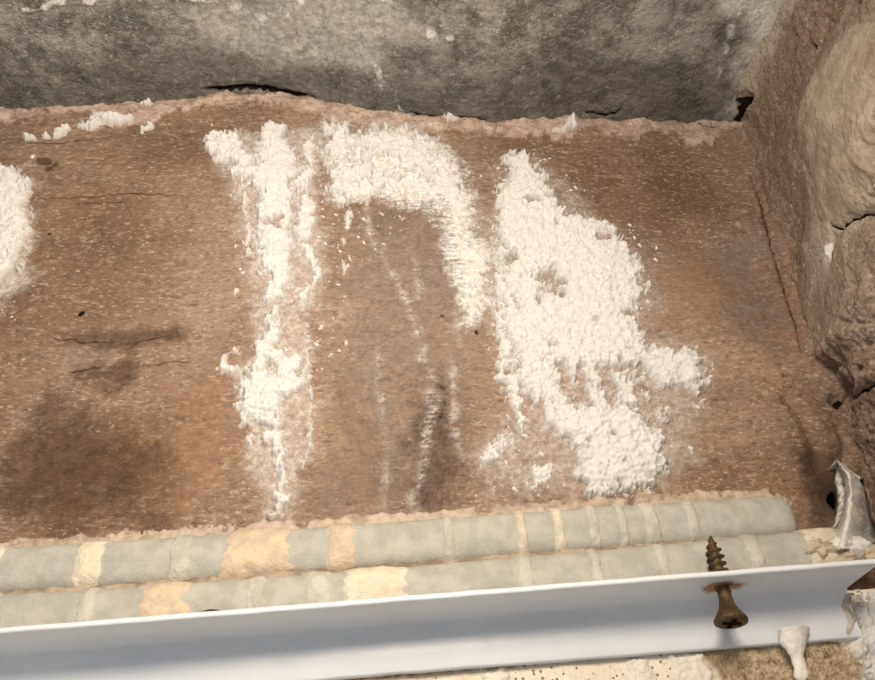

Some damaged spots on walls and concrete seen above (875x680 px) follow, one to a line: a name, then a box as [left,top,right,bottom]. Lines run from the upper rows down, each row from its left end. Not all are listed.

crack [832,214,875,230]
damp [0,0,747,622]
crack [832,382,875,410]
rust [703,582,742,593]